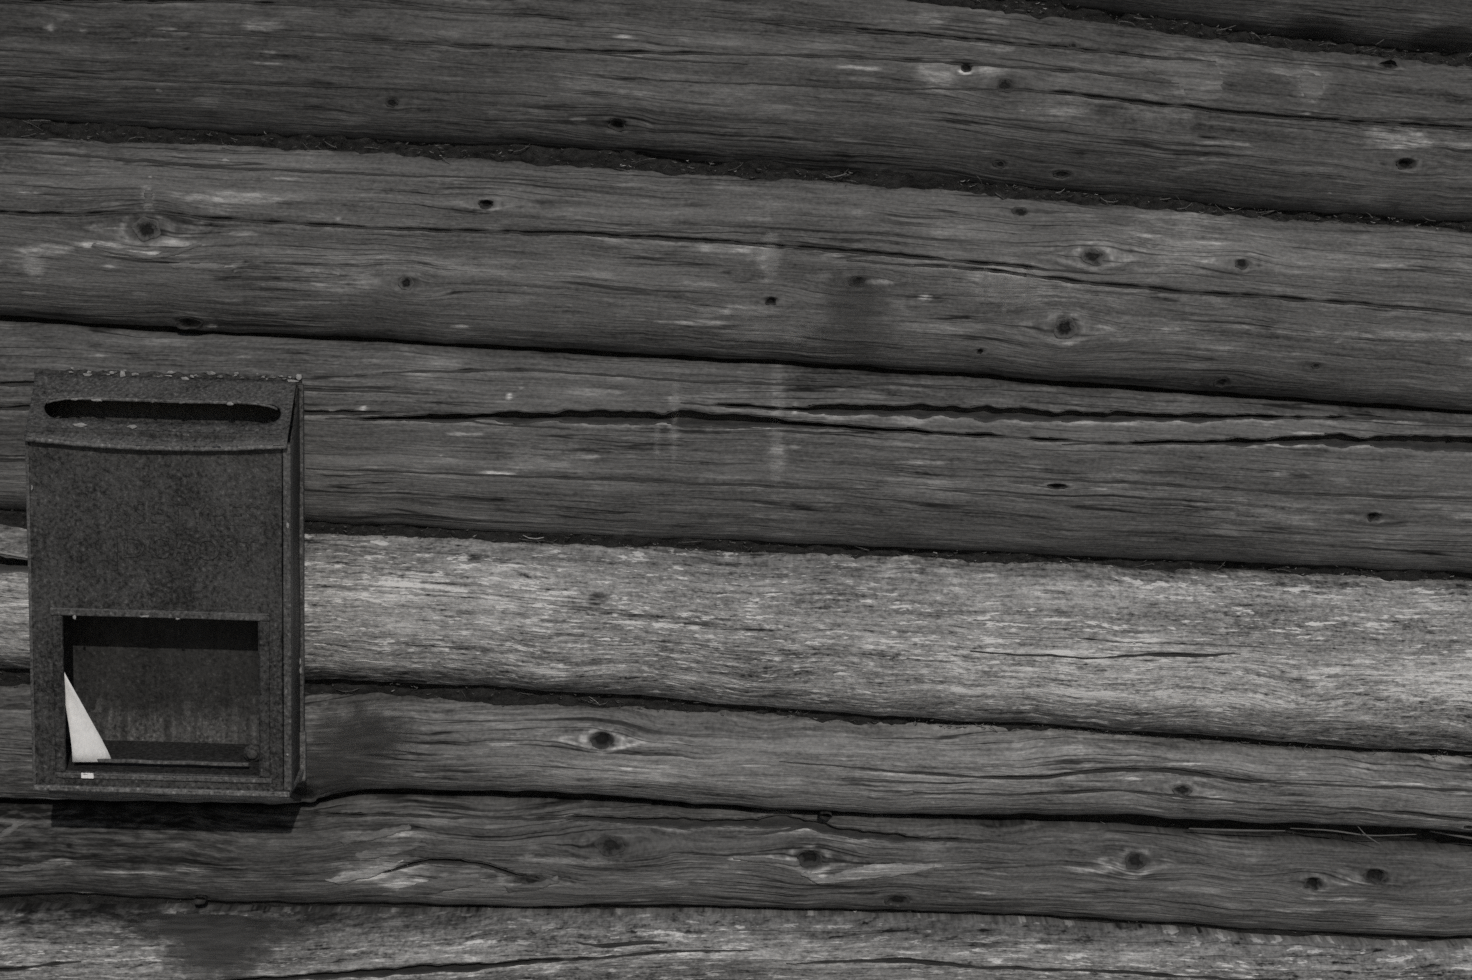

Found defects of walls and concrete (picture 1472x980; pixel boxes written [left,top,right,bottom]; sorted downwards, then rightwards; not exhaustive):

crack [0,356,34,411]
crack [304,368,1472,499]
crack [264,808,1027,845]
crack [383,857,542,881]
crack [0,961,81,971]
crack [224,940,753,980]
crack [786,957,1277,980]